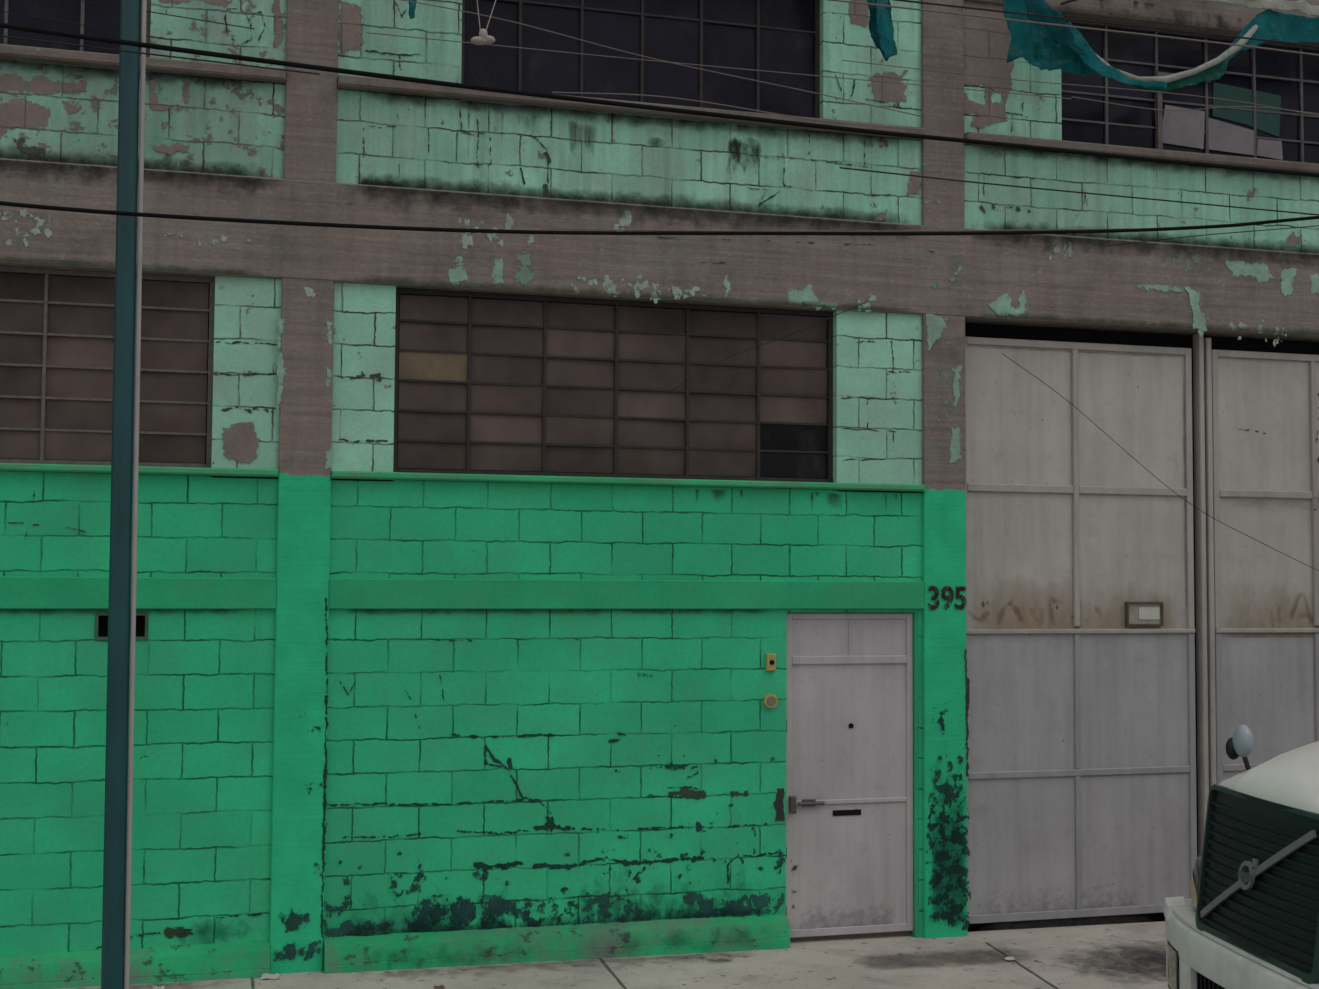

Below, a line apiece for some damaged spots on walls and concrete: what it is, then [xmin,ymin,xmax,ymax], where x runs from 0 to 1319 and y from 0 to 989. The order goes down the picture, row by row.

peeling [0,74,87,155]
peeling [448,213,535,286]
peeling [614,208,632,229]
peeling [571,274,706,304]
peeling [222,309,287,463]
crack [320,598,778,938]
spalling [650,755,707,800]
spalling [688,790,749,832]
spalling [773,788,785,821]
spalling [926,748,971,930]
spalling [273,856,655,963]
spalling [648,847,797,919]